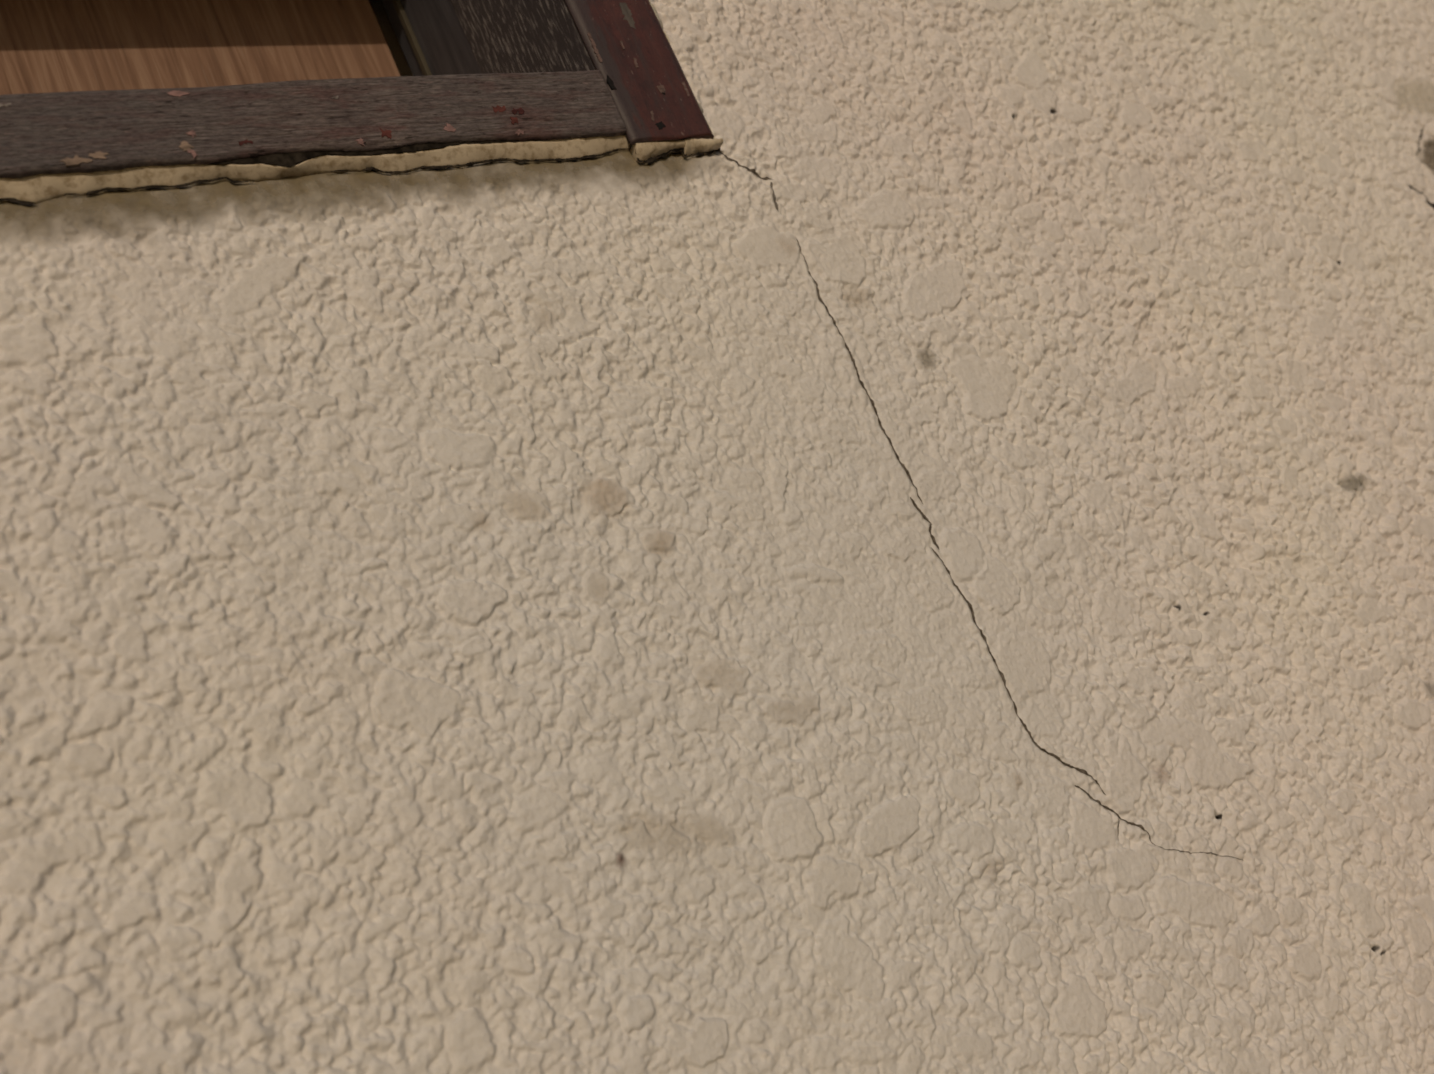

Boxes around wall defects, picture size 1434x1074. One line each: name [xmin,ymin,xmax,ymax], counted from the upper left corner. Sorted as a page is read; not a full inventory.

crack [326,148,778,210]
crack [797,240,1243,860]